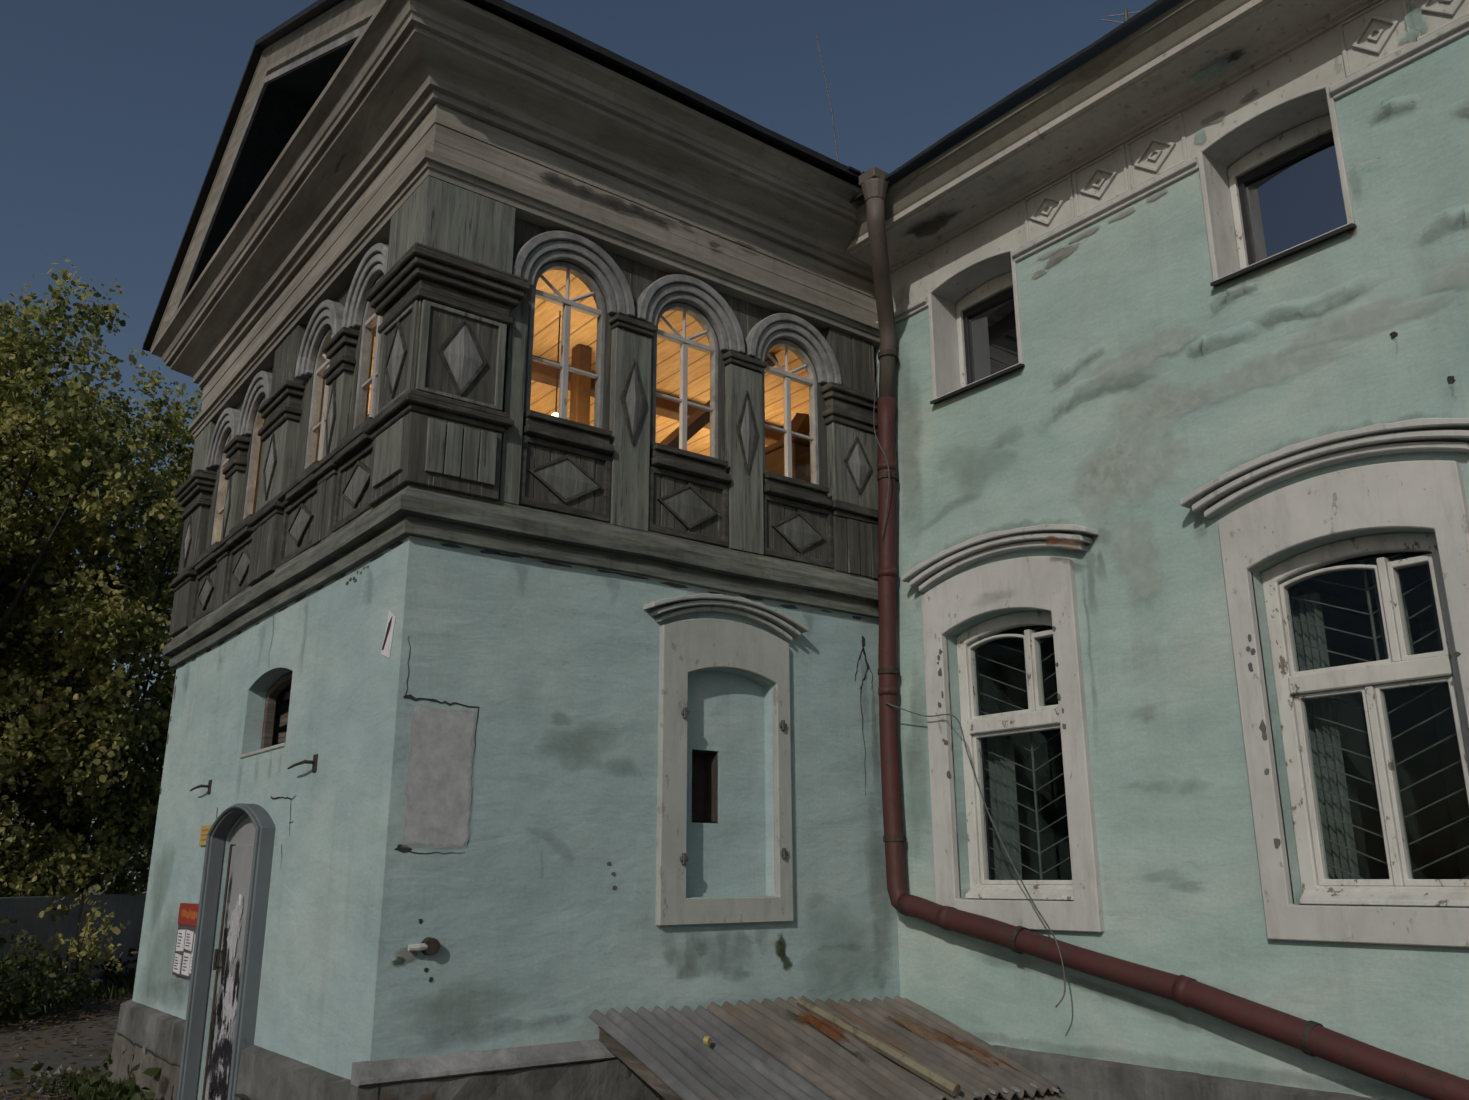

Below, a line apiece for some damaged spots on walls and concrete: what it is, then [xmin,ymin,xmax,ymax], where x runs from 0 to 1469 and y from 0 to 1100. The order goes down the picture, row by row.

crack [855,636,873,796]
peeling [206,872,251,1100]
leakage [779,942,791,969]